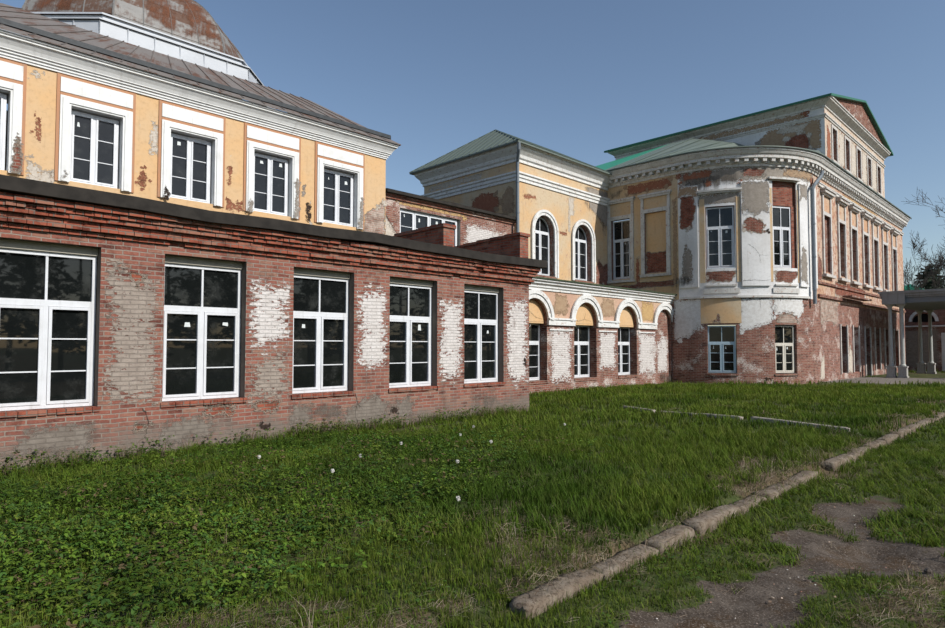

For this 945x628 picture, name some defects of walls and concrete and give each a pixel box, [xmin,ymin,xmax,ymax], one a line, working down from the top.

corrosion [33,0,72,9]
corrosion [148,0,217,39]
flaking render [8,113,67,183]
peeling [462,215,502,243]
flaking render [596,166,813,289]
peeling [103,258,161,407]
peeling [248,279,291,430]
peeling [356,283,388,370]
peeling [439,299,463,388]
peeling [506,299,530,389]
peeling [598,332,617,371]
peeling [638,332,690,375]